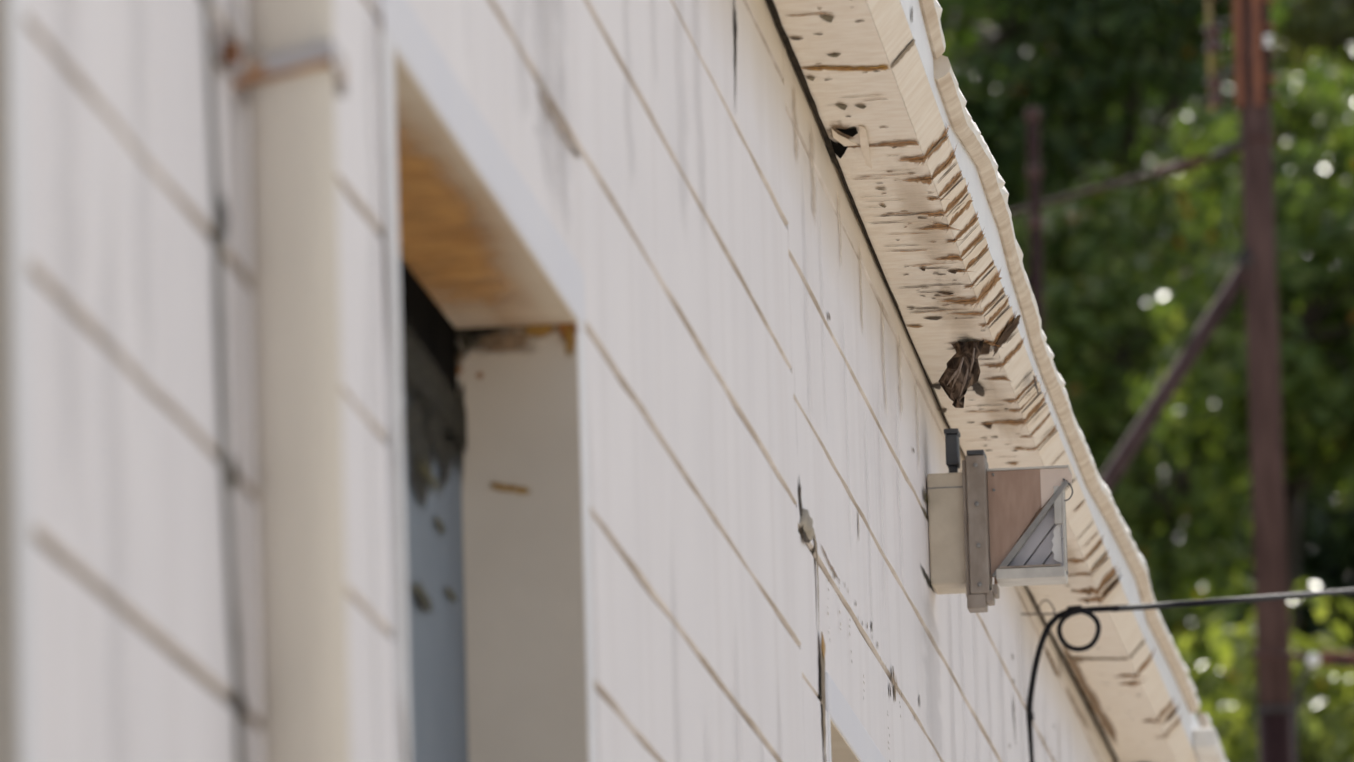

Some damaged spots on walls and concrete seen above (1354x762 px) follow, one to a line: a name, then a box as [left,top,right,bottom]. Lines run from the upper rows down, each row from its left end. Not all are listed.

peeling [831,104,1059,465]
peeling [1066,535,1122,606]
mould [412,583,432,613]
peeling [1087,650,1155,696]
peeling [1142,698,1182,740]